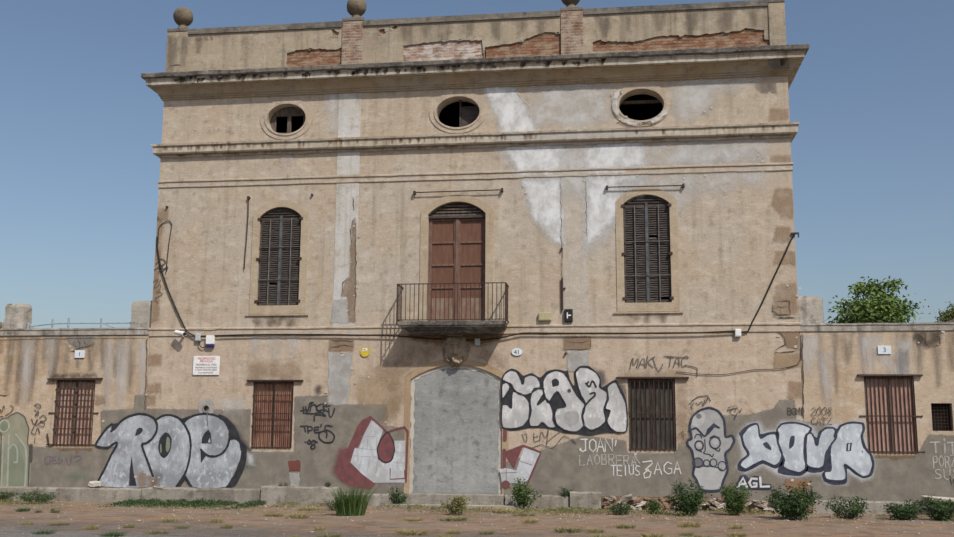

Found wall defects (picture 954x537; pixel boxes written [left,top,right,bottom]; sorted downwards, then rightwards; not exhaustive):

flaking render [287,30,342,67]
flaking render [403,32,561,62]
flaking render [593,28,769,52]
peeling [341,221,360,323]
leakage [23,345,31,382]
leakage [802,338,828,389]